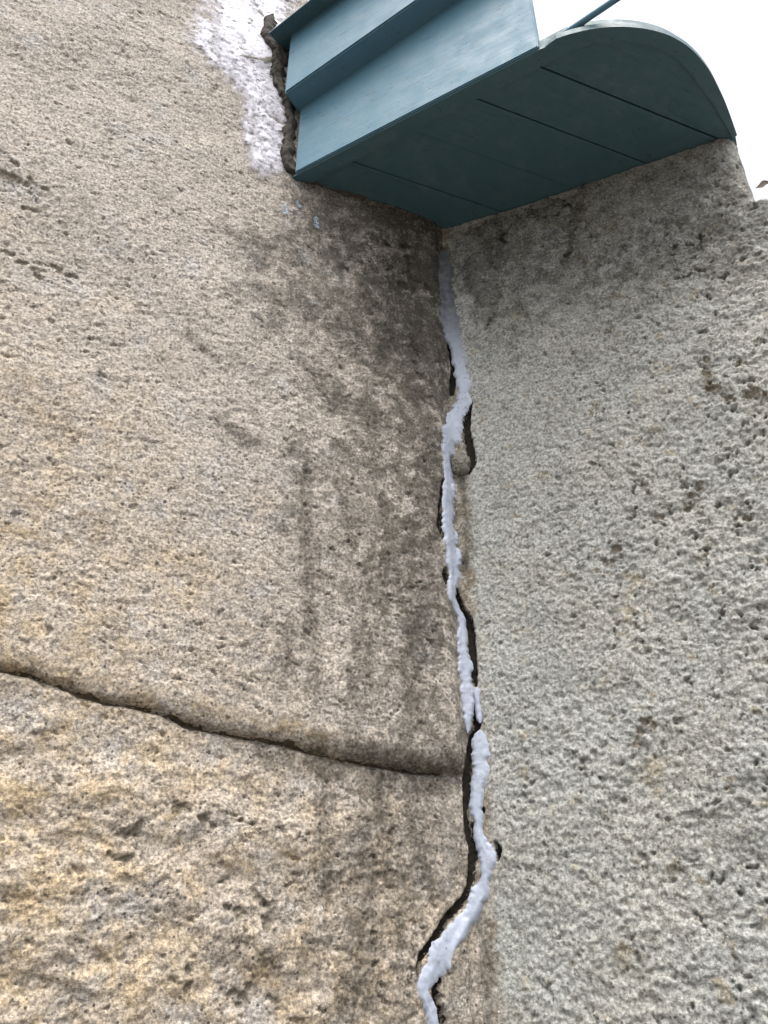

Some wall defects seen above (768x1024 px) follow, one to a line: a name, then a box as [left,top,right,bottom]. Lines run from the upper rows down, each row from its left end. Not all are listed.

damp [214,175,445,499]
crack [0,250,502,1024]
damp [278,445,317,643]
damp [401,520,444,709]